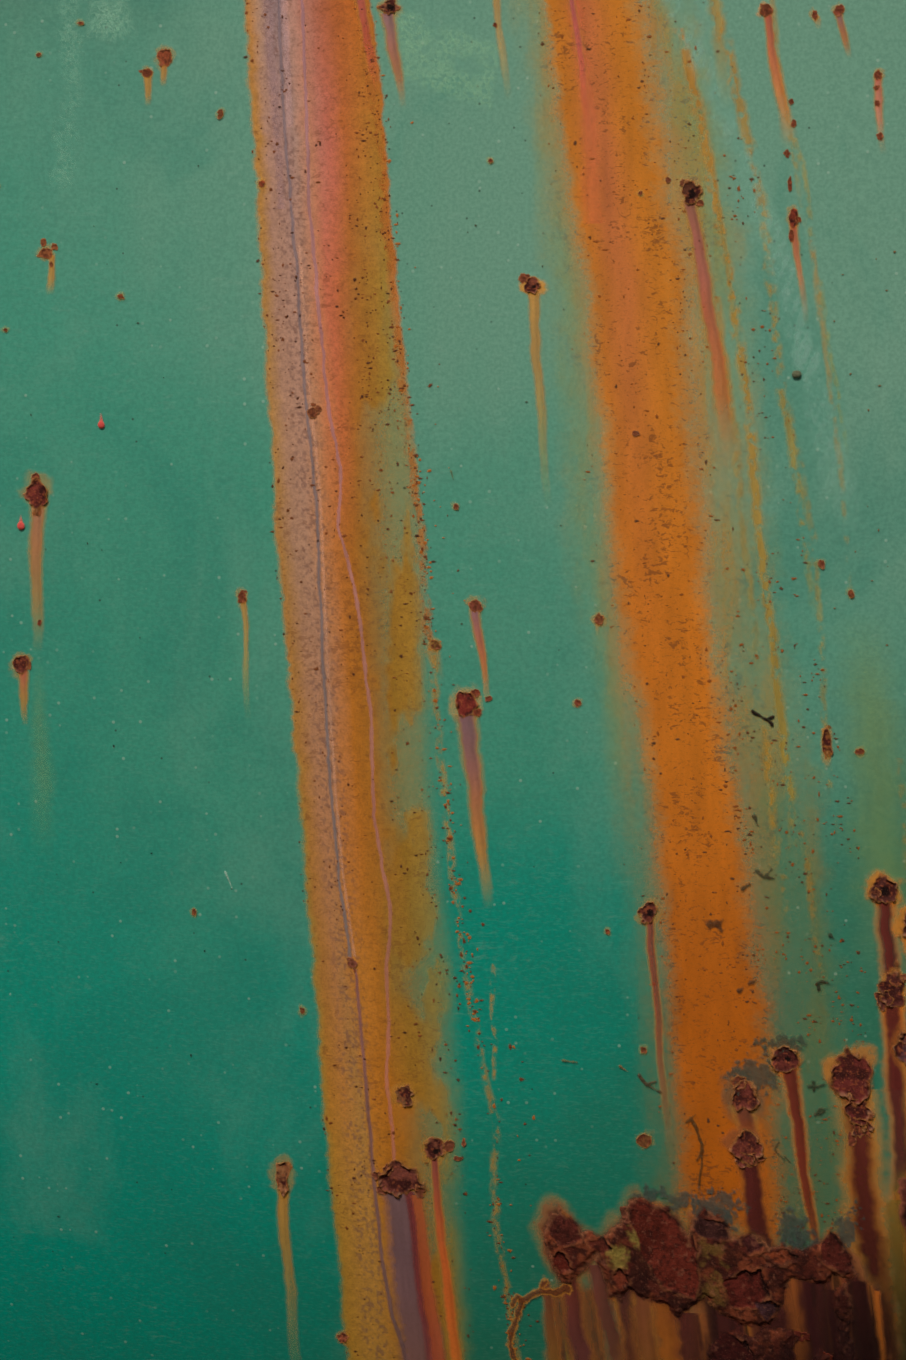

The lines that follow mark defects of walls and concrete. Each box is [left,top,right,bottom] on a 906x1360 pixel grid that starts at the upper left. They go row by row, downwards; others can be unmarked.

corrosion [37,238,58,287]
corrosion [23,472,50,626]
corrosion [236,589,249,677]
corrosion [10,653,31,715]
corrosion [243,0,906,1360]